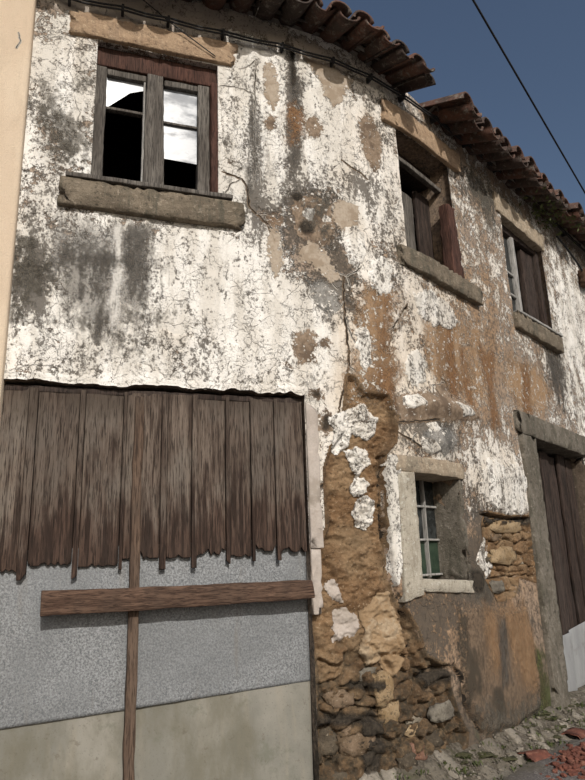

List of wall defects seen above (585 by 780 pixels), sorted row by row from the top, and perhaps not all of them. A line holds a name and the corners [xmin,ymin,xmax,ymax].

water stain [31,81,91,162]
crack [220,60,285,254]
peeling [262,61,280,131]
peeling [302,116,324,138]
peeling [297,53,354,107]
peeling [356,112,382,173]
water stain [11,223,153,357]
crack [324,254,362,413]
peeling [404,349,428,388]
peeling [412,288,459,329]
peeling [380,454,403,587]
spalling [476,457,537,602]